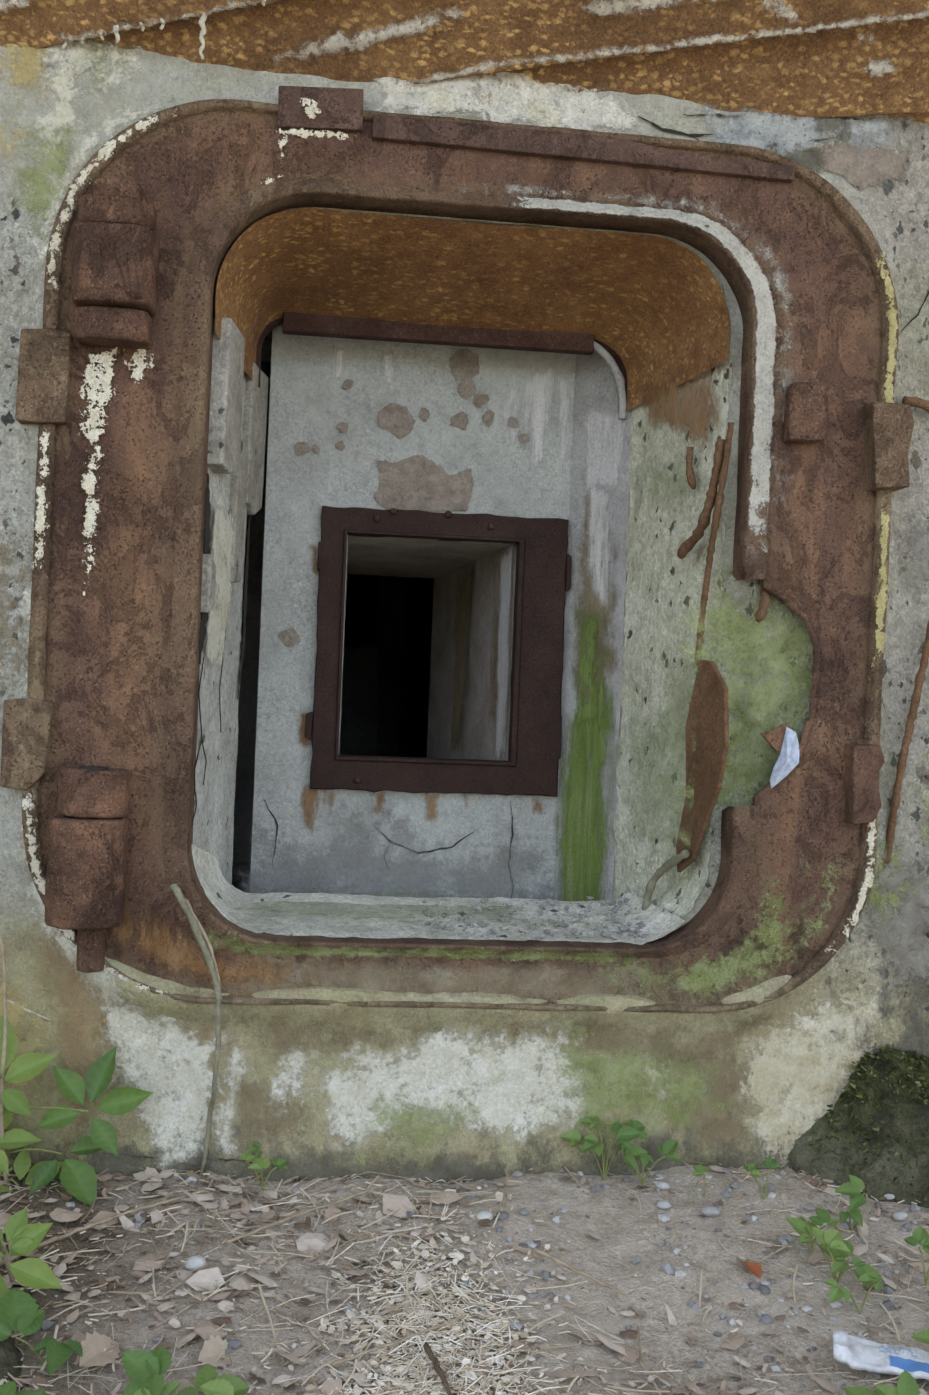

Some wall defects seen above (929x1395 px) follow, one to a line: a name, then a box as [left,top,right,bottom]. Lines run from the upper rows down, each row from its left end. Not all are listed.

crack [638,113,745,141]
crack [899,291,929,335]
spalling [377,403,430,439]
rust [642,375,719,441]
peeling [32,425,51,569]
peeling [79,347,155,596]
flaking render [374,455,474,511]
rust [489,563,501,716]
rust [302,786,334,829]
crack [372,824,473,872]
rust [113,897,293,987]
damp [11,813,929,1184]